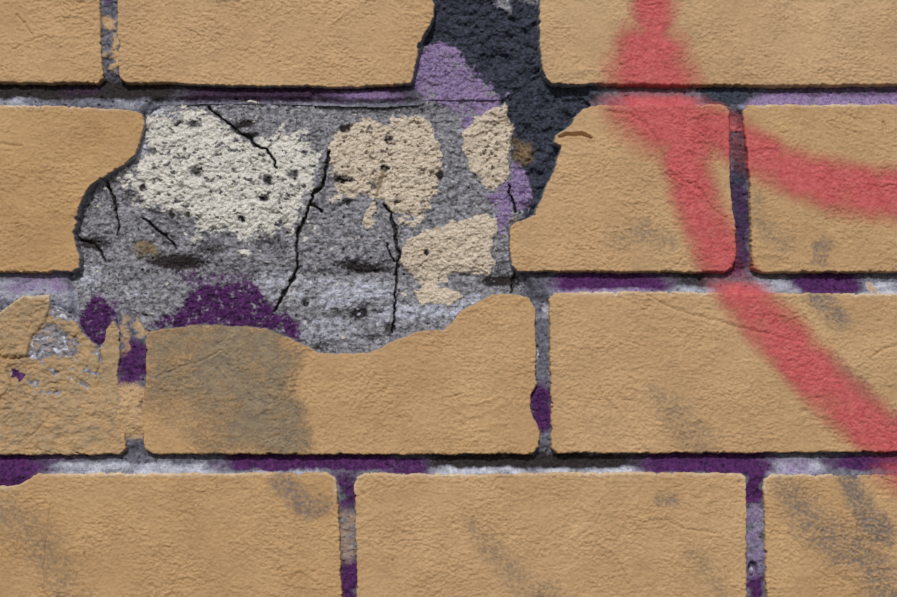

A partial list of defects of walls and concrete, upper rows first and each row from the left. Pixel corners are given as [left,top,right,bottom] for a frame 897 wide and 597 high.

crack [80,181,120,261]
crack [143,218,177,249]
crack [207,106,278,169]
spalling [6,0,593,387]
crack [273,150,331,312]
crack [383,203,402,334]